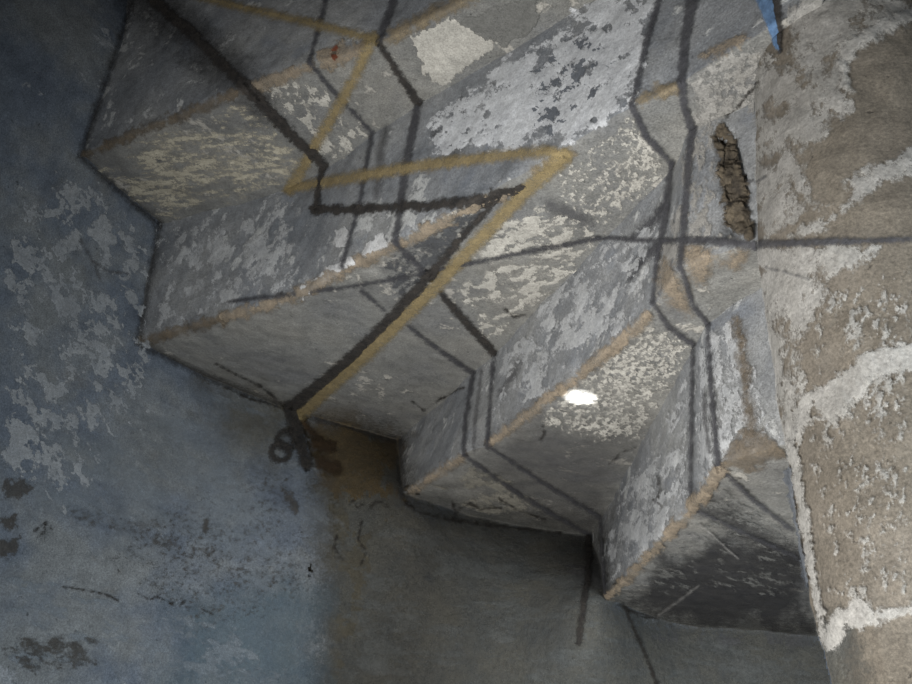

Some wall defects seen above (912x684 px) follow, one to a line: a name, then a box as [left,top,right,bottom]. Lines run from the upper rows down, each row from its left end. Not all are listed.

damp [311,413,399,504]
flaking render [314,0,912,684]